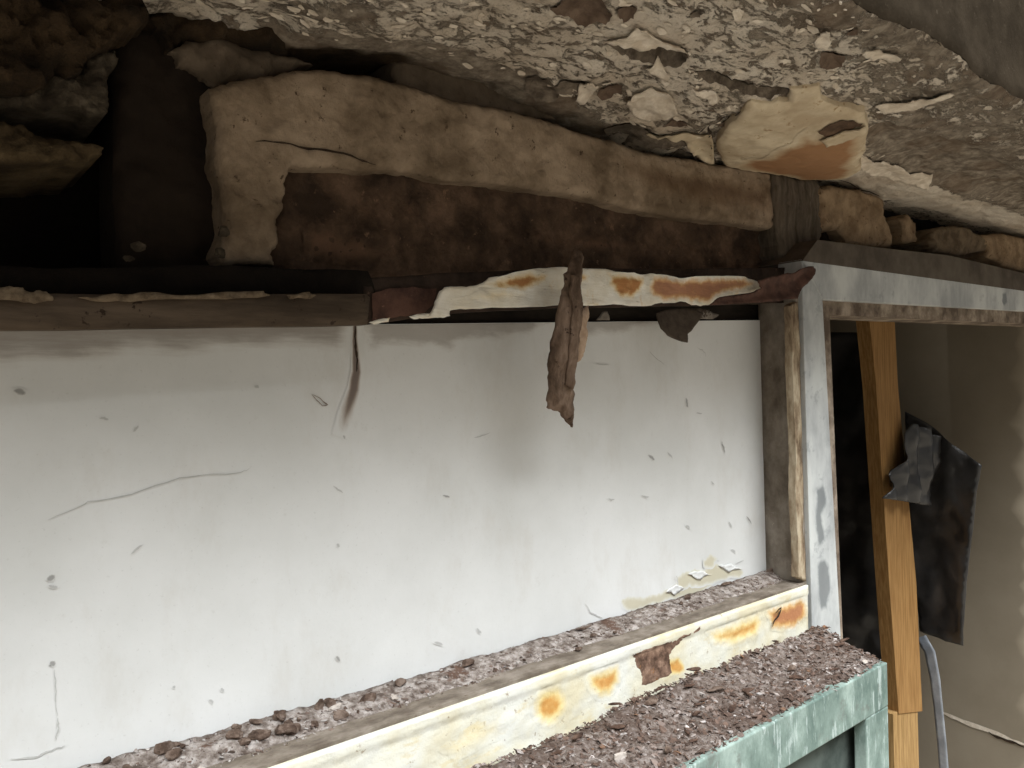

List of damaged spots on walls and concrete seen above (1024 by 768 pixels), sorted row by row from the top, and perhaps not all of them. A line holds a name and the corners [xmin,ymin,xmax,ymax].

peeling [234,0,351,41]
peeling [499,0,901,165]
peeling [851,92,954,114]
crack [256,140,376,165]
rust [732,125,867,180]
peeling [860,154,933,190]
spalling [270,172,762,278]
rust [608,266,816,305]
peeling [656,308,718,343]
crack [48,466,252,520]
peeling [620,553,744,612]
rust [632,595,808,691]